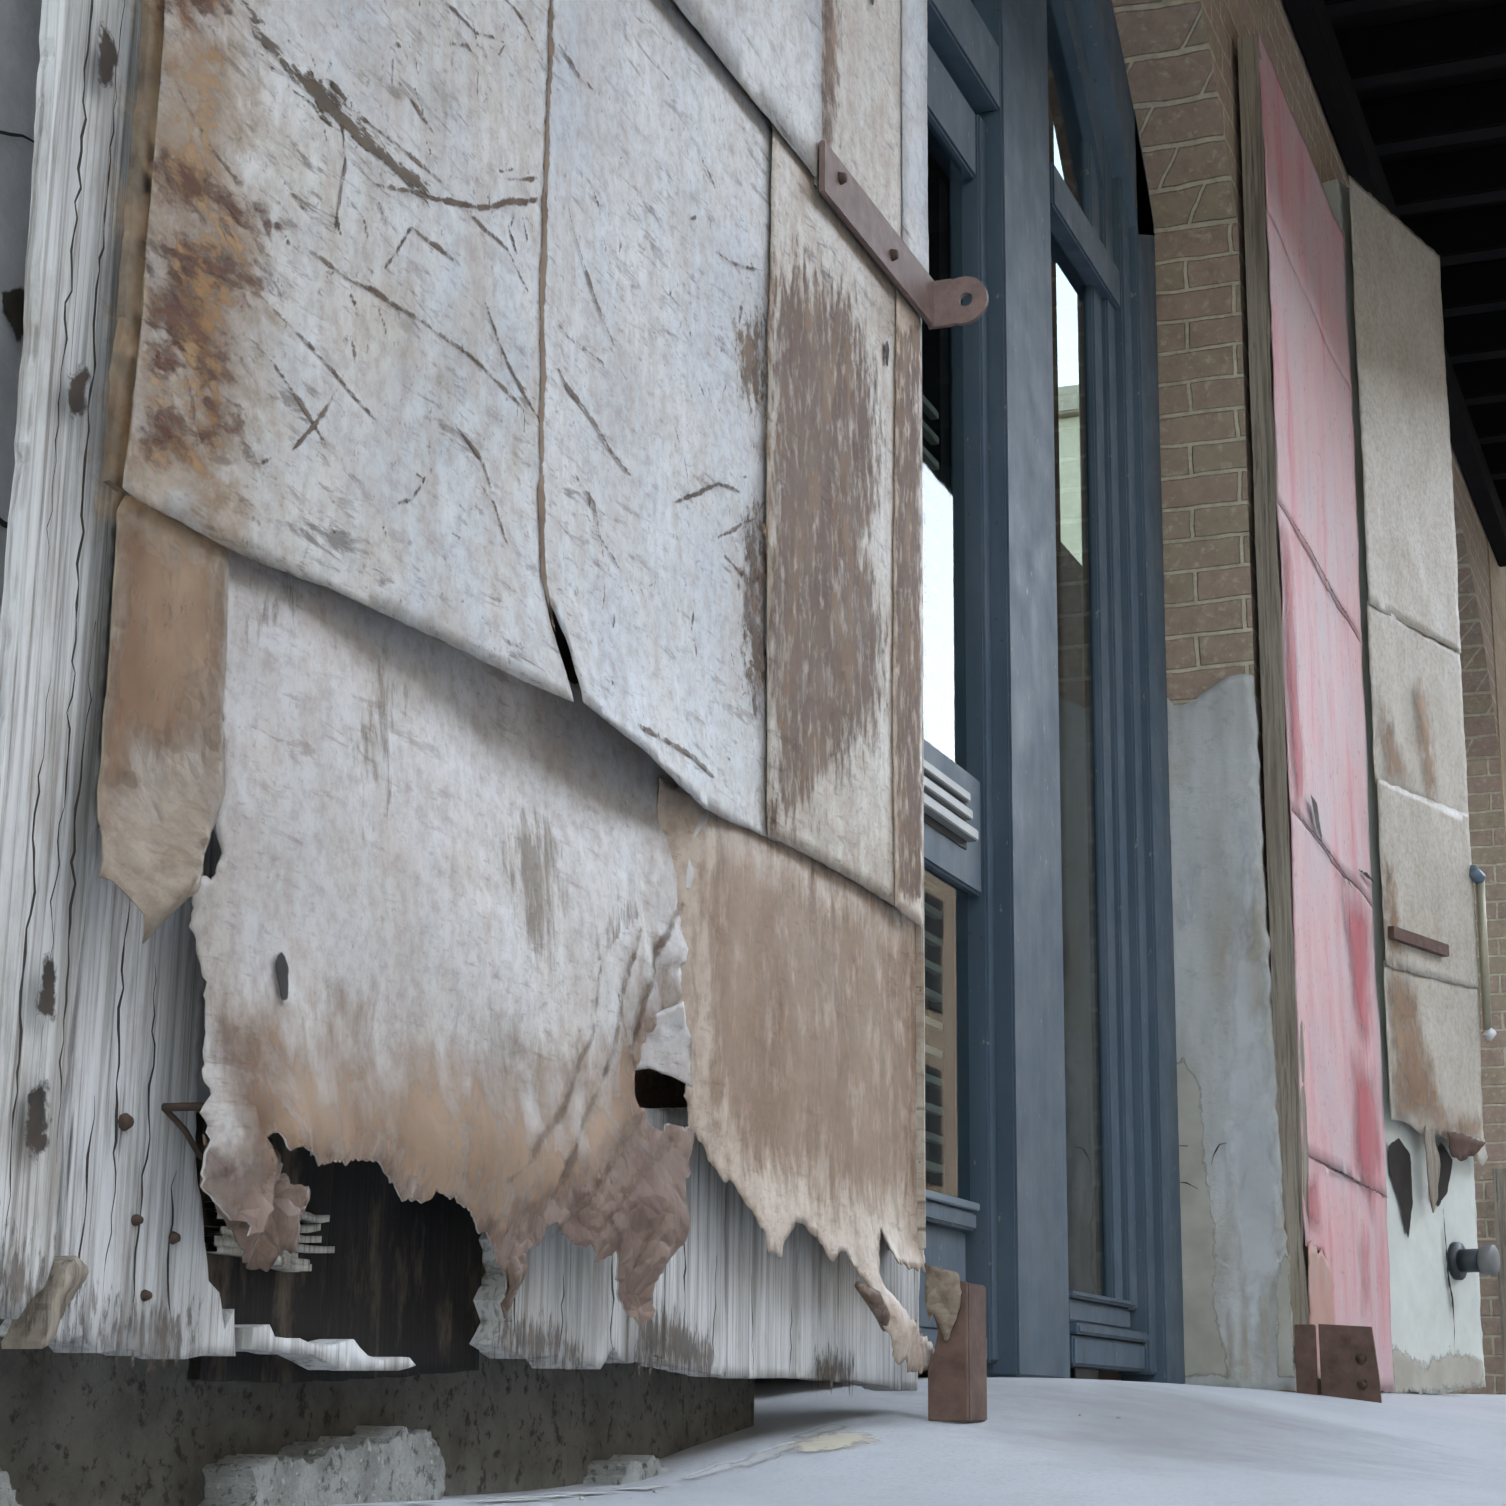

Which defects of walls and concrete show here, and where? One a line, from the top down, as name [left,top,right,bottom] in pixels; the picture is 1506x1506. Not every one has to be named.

crack [0,0,177,1336]
rust [131,0,430,509]
rust [733,239,925,904]